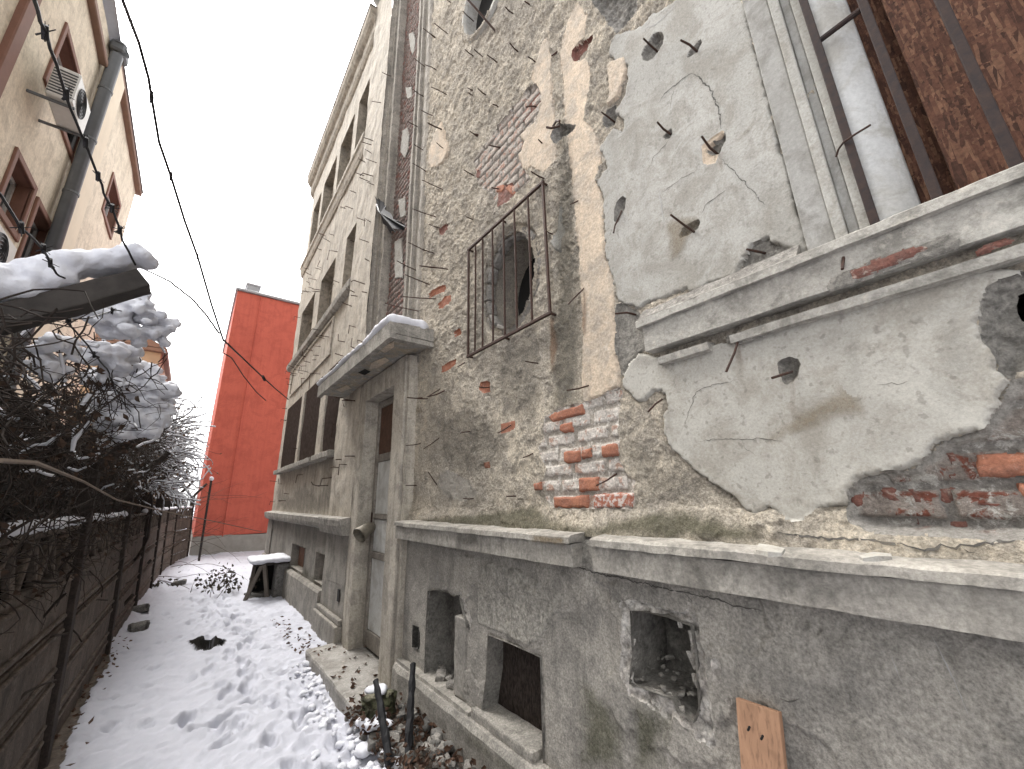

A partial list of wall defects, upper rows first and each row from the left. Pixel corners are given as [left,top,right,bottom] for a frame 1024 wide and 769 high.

crack [660,73,721,128]
flaking render [473,0,645,510]
crack [703,159,765,210]
spalling [827,234,960,292]
flaking render [846,271,1024,543]
spalling [619,600,722,750]